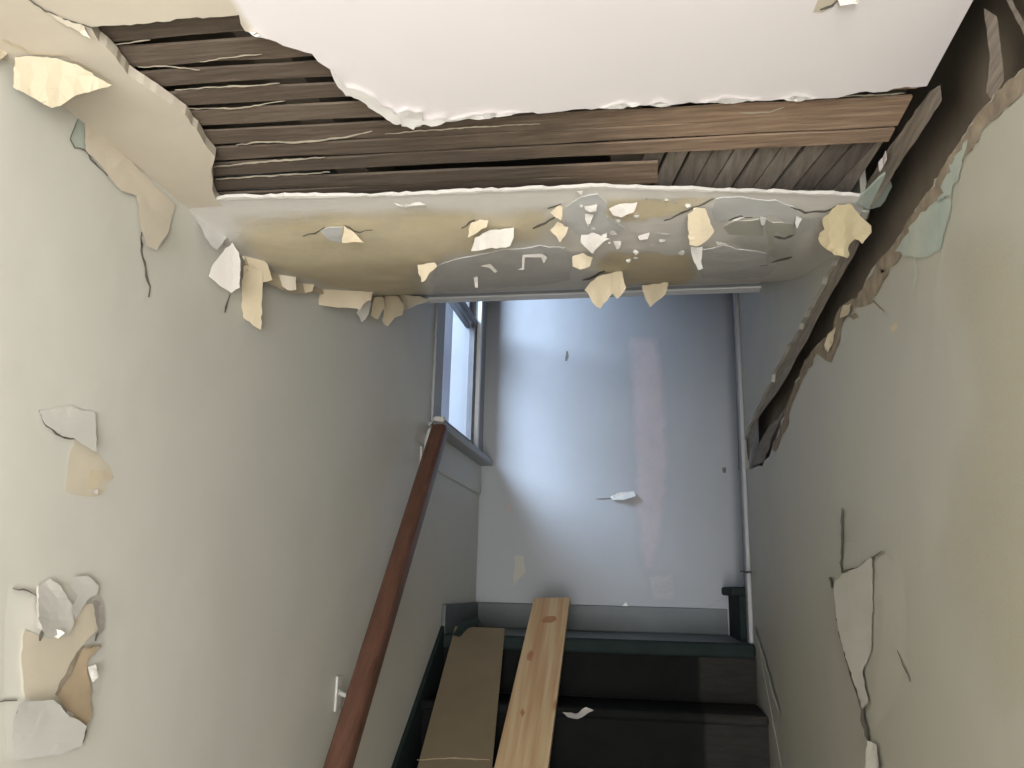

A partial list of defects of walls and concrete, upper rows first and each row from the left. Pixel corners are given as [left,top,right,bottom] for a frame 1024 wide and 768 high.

peeling [813,0,860,12]
crack [140,232,151,297]
peeling [195,187,872,330]
spalling [772,68,1024,452]
peeling [39,406,113,497]
peeling [0,576,105,760]
peeling [829,509,882,768]